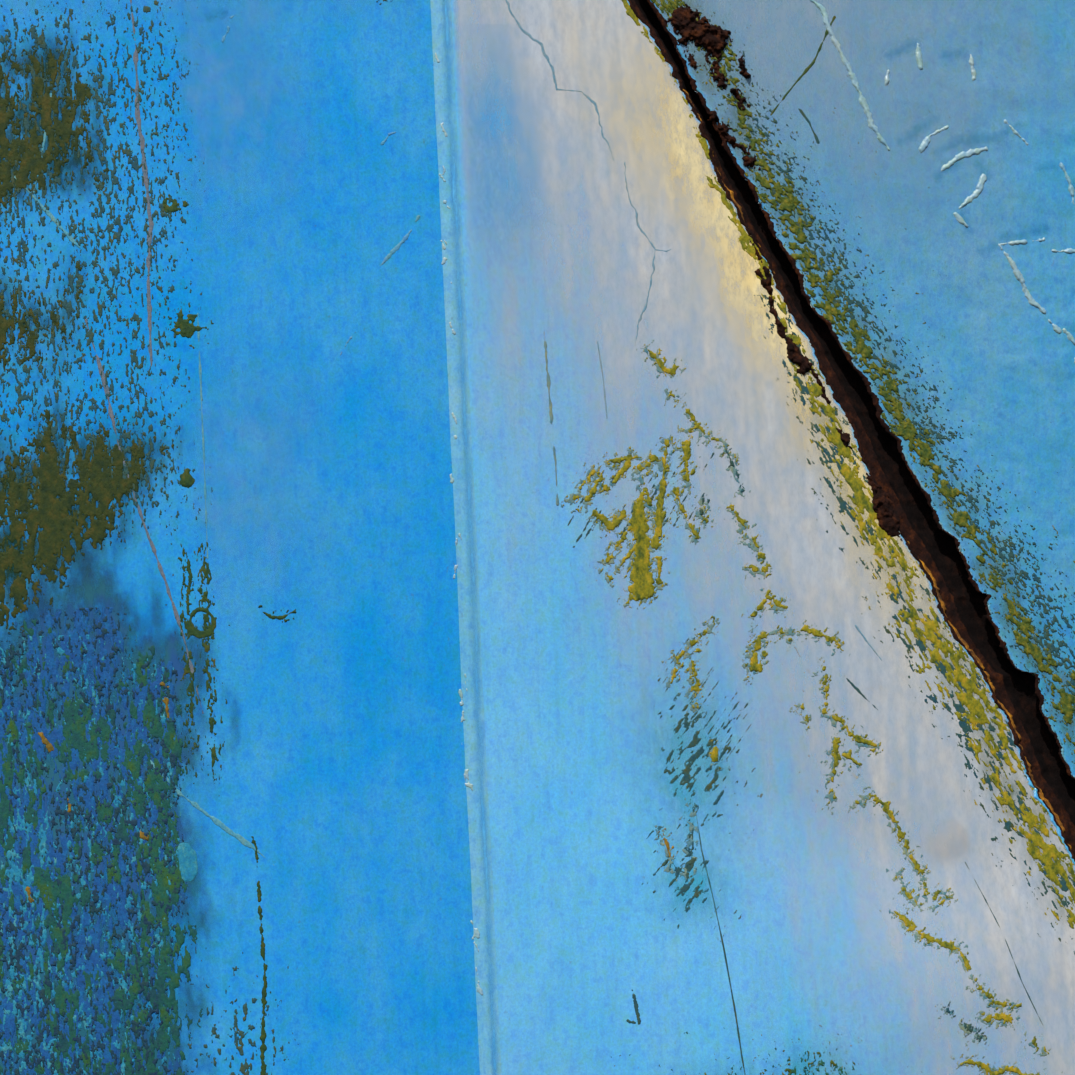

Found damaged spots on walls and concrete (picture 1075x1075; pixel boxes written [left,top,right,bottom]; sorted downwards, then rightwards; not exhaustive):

peeling [0,261,93,382]
peeling [0,39,109,212]
crack [505,0,673,344]
corrosion [665,3,751,111]
peeling [458,0,1075,1075]
crack [628,0,1075,865]